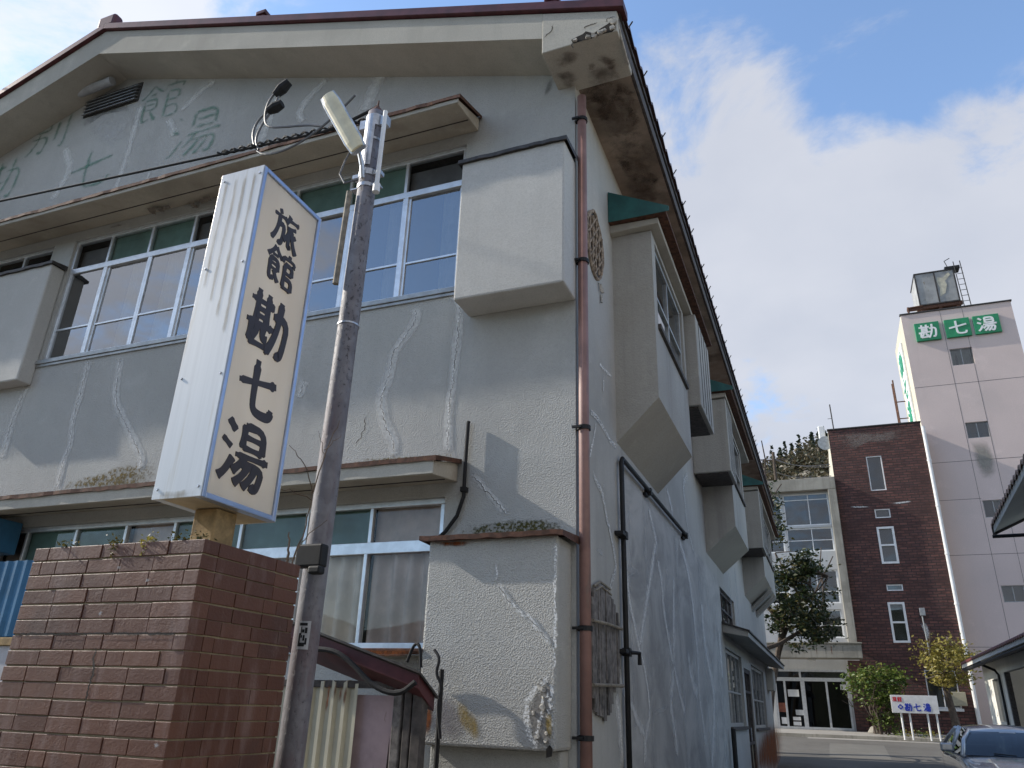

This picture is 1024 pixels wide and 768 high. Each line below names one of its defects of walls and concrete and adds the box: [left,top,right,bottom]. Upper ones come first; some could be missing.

crack [56,361,90,487]
crack [112,360,145,469]
crack [356,308,421,454]
crack [443,296,463,450]
crack [495,565,551,646]
crack [590,363,723,766]
spalling [523,678,554,758]